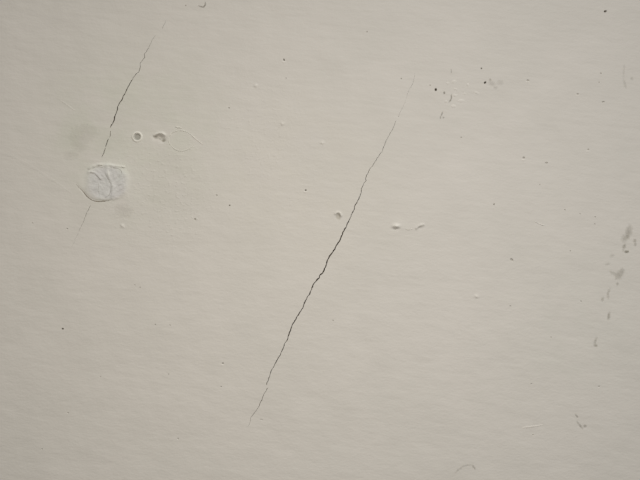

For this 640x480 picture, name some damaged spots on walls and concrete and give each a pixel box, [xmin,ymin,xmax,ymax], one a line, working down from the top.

crack [102,25,164,156]
crack [250,81,414,421]